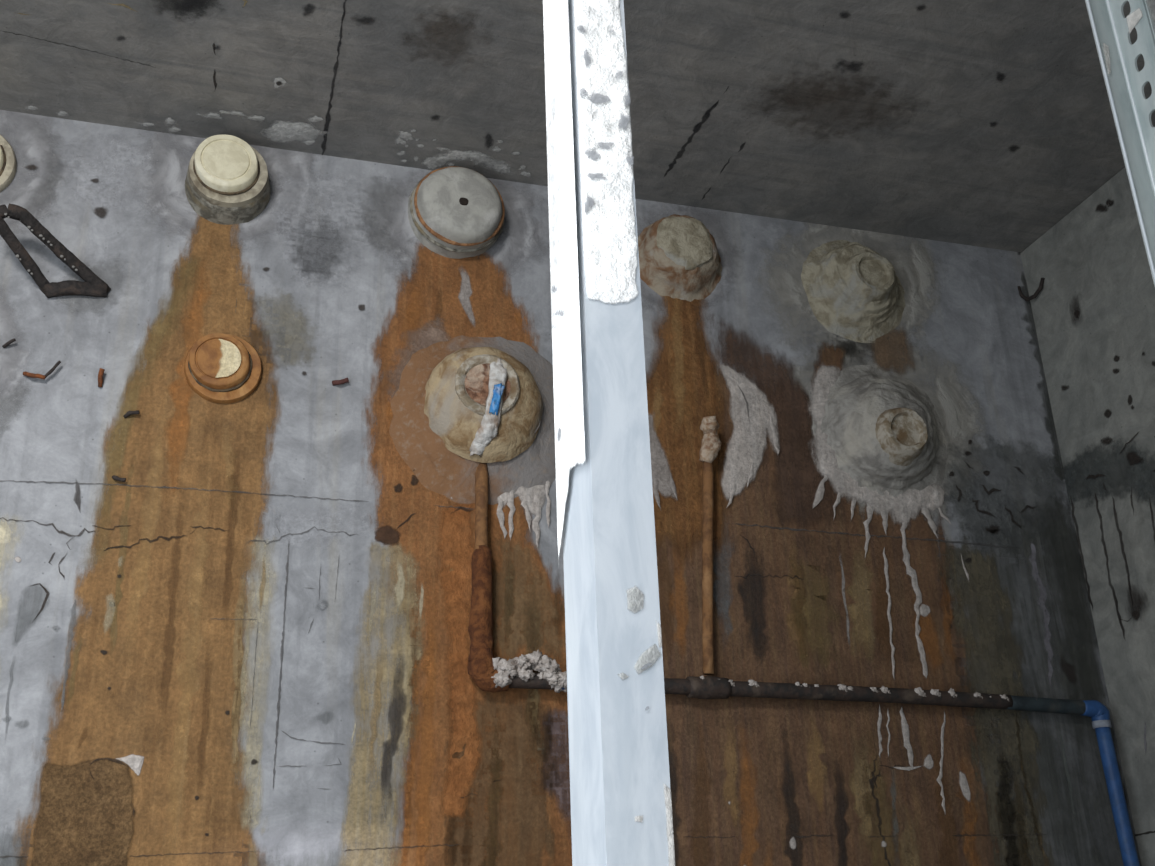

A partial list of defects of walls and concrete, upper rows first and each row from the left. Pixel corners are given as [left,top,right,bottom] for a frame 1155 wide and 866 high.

rust [46,215,278,866]
crack [0,517,358,578]
rust [366,166,572,866]
water stain [497,481,551,547]
water stain [720,365,780,508]
rust [646,296,1024,696]
water stain [809,366,957,697]
water stain [870,547,946,813]
spalling [32,754,144,866]
rust [665,694,1051,866]
water stain [959,772,970,801]